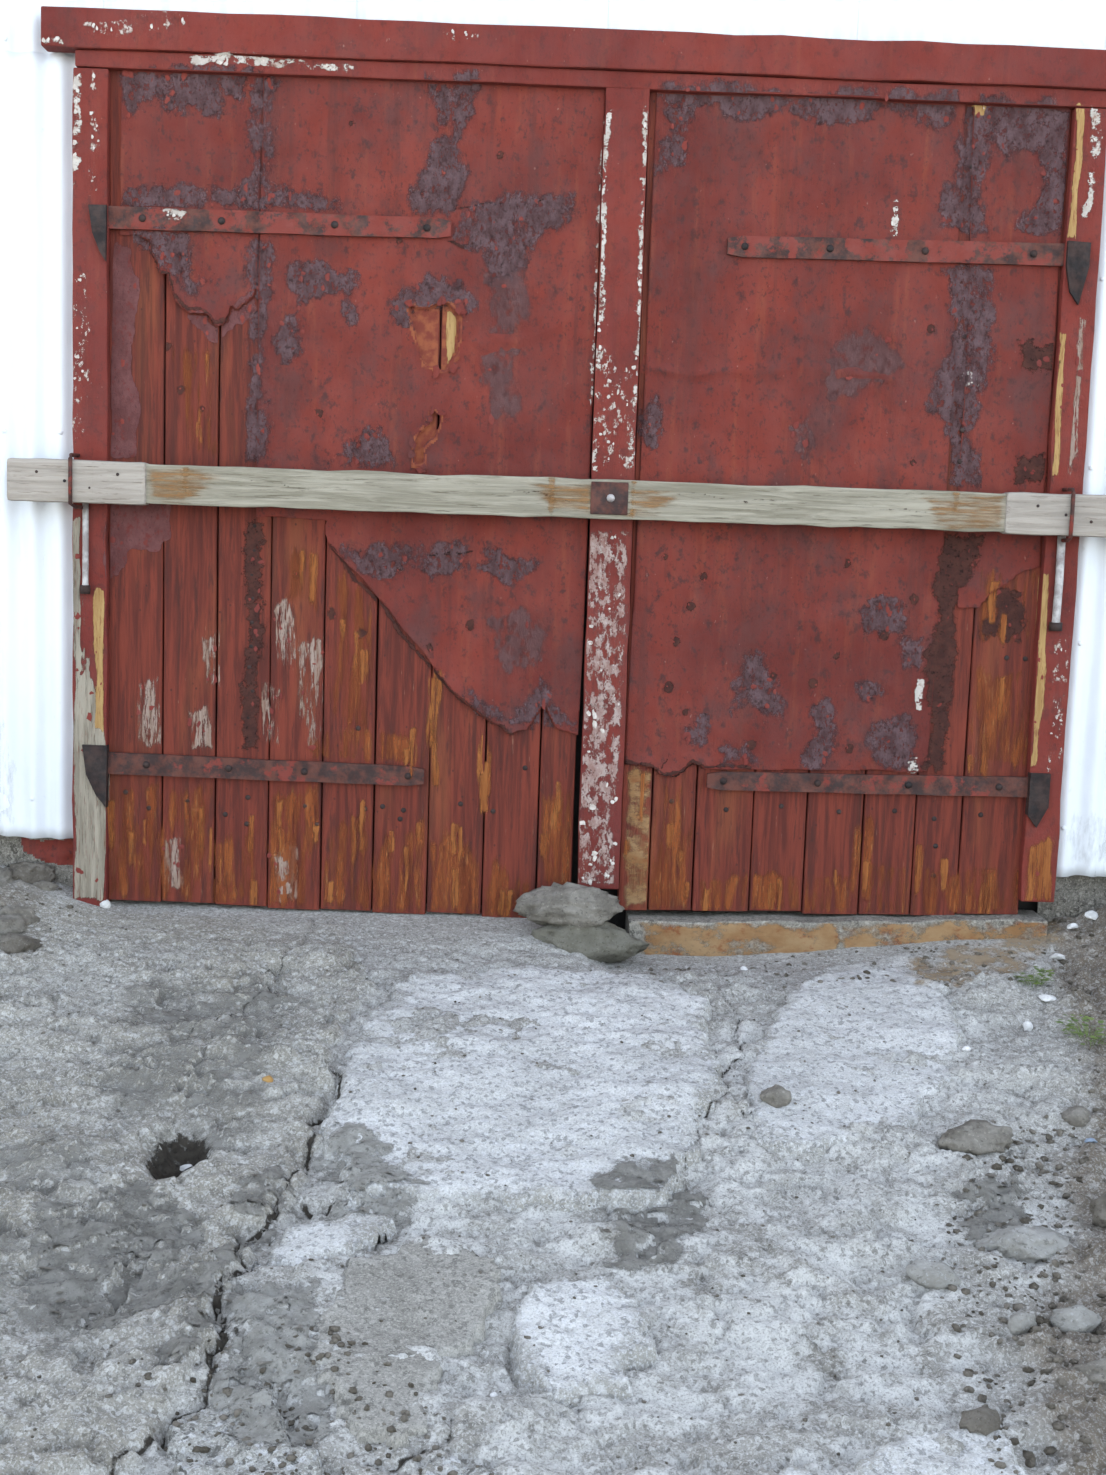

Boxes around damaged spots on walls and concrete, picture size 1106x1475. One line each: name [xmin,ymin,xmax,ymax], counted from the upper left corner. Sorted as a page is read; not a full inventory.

peeling [390,69,576,424]
peeling [590,77,1103,488]
peeling [187,706,212,749]
peeling [202,633,220,684]
peeling [238,519,325,751]
rust [290,546,513,814]
peeling [340,539,539,586]
peeling [462,531,627,885]
peeling [859,533,985,774]
peeling [978,574,1069,772]
peeling [162,838,184,890]
peeling [267,847,298,903]